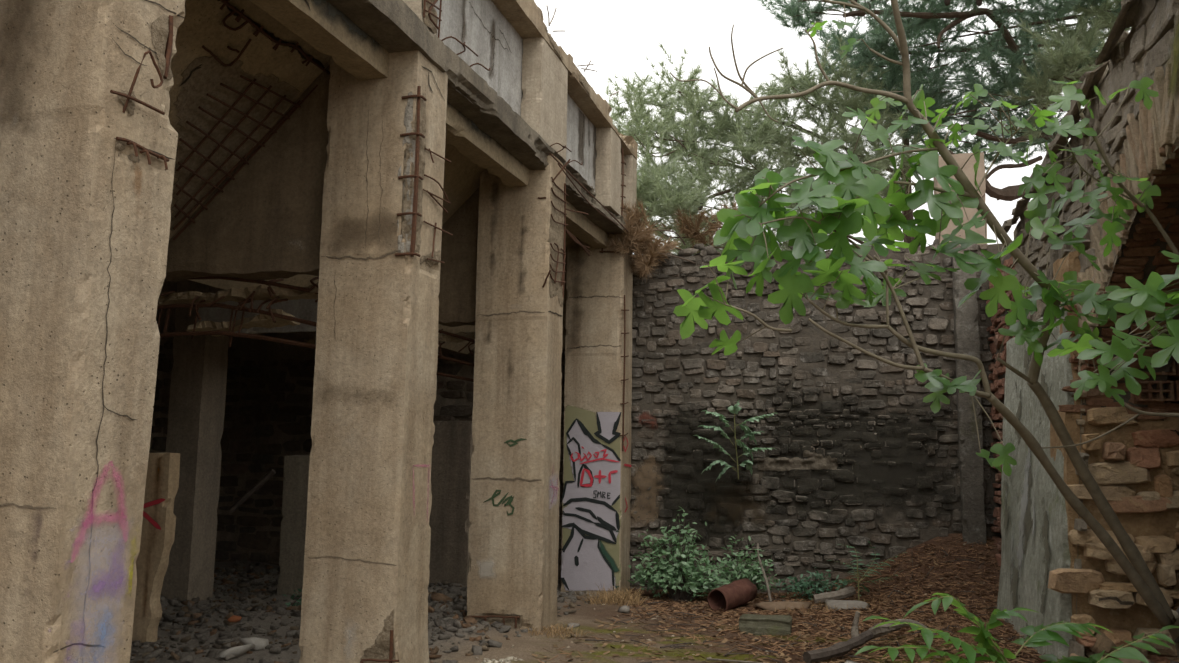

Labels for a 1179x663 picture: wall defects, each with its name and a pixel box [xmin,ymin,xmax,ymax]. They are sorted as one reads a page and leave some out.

crack [53,138,175,663]
spalling [110,0,330,231]
spalling [157,276,319,349]
crack [321,112,401,342]
spalling [395,86,453,267]
crack [0,502,57,510]
spalling [360,610,399,663]
spalling [468,613,522,628]